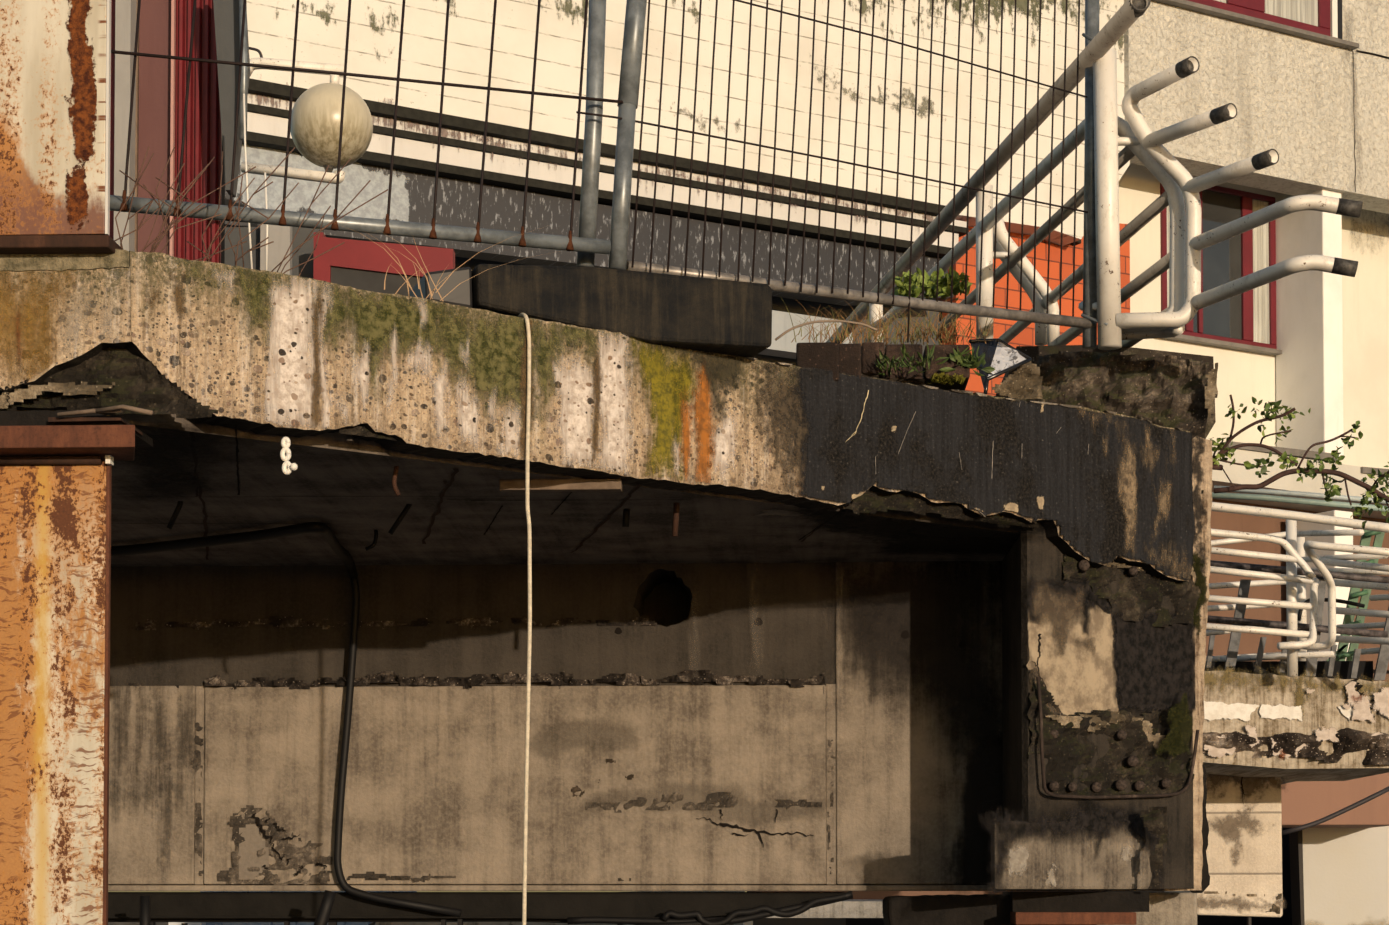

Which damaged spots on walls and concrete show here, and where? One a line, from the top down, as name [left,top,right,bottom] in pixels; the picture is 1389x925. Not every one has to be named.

corrosion [64,0,97,232]
spalling [0,347,218,419]
leakage [265,278,347,427]
leakage [355,352,369,400]
leakage [387,321,535,457]
leakage [554,333,809,493]
corrosion [679,369,715,483]
spalling [843,489,1044,524]
spalling [920,385,1200,627]
spalling [1027,671,1389,799]
spalling [191,722,456,885]
crack [696,809,814,847]